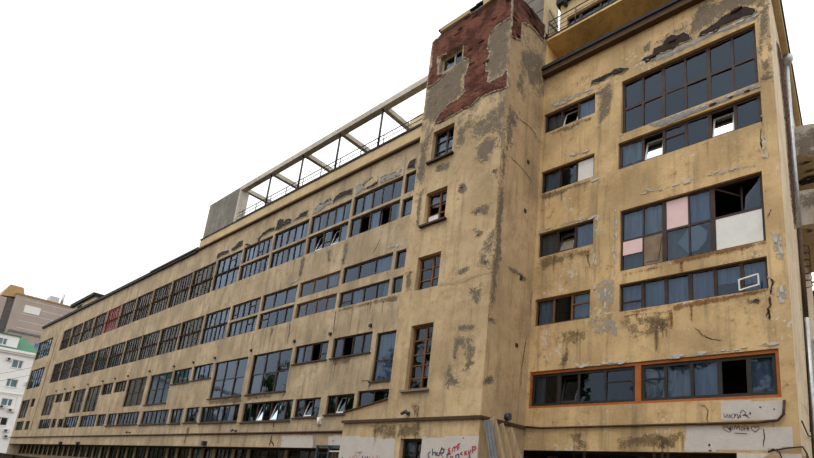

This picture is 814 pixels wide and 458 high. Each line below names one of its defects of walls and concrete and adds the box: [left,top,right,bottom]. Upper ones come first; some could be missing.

spalling [216,0,546,324]
peeling [536,215,599,235]
peeling [551,67,629,128]
peeling [592,208,618,336]
peeling [641,0,814,229]